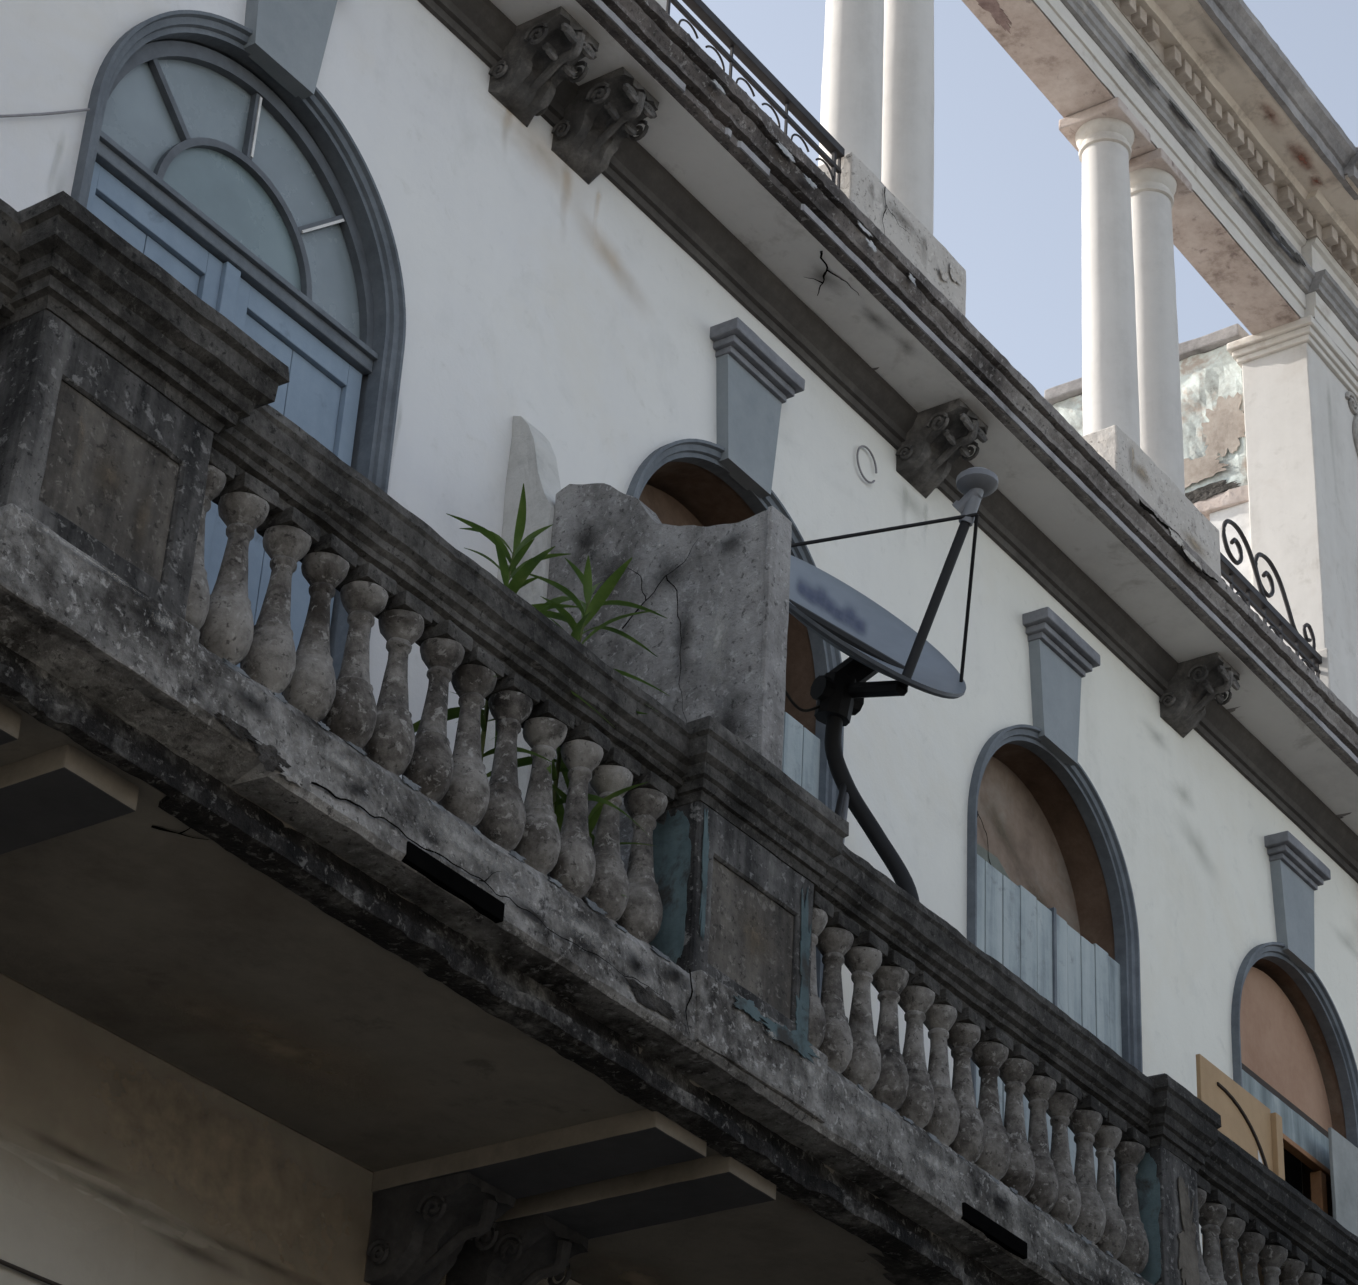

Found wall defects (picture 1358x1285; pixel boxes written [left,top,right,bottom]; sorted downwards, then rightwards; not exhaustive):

peeling [976,0,1012,34]
crack [805,251,859,296]
peeling [1184,392,1245,503]
peeling [401,775,448,813]
crack [311,782,693,1033]
damp [520,902,543,922]
peeling [649,808,709,964]
damp [631,954,645,973]
peeling [733,887,820,1063]